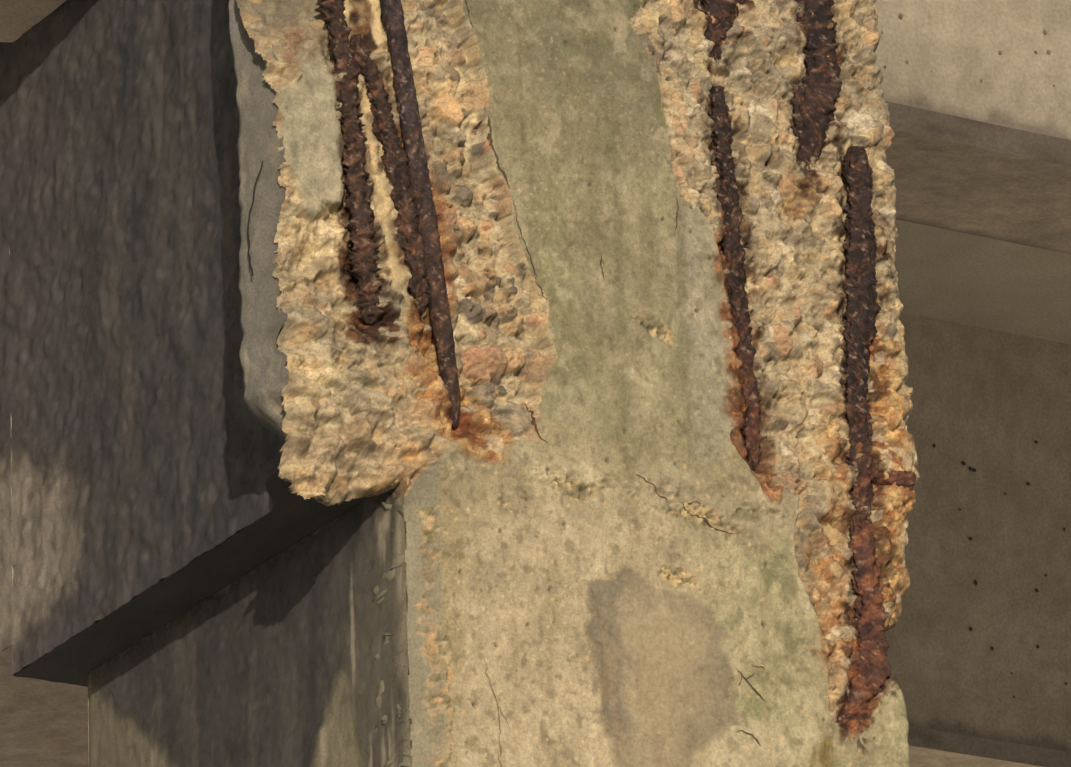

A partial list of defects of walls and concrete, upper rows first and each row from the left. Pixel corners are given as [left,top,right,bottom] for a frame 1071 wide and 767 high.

crack [247,161,263,276]
spalling [236,0,458,507]
rust [331,0,384,122]
rust [337,128,511,461]
spalling [401,0,558,441]
rust [689,0,755,150]
rust [716,171,782,501]
spalling [629,0,920,730]
rust [796,0,814,76]
rust [783,116,915,767]
crack [483,653,510,767]
leakage [588,568,736,767]